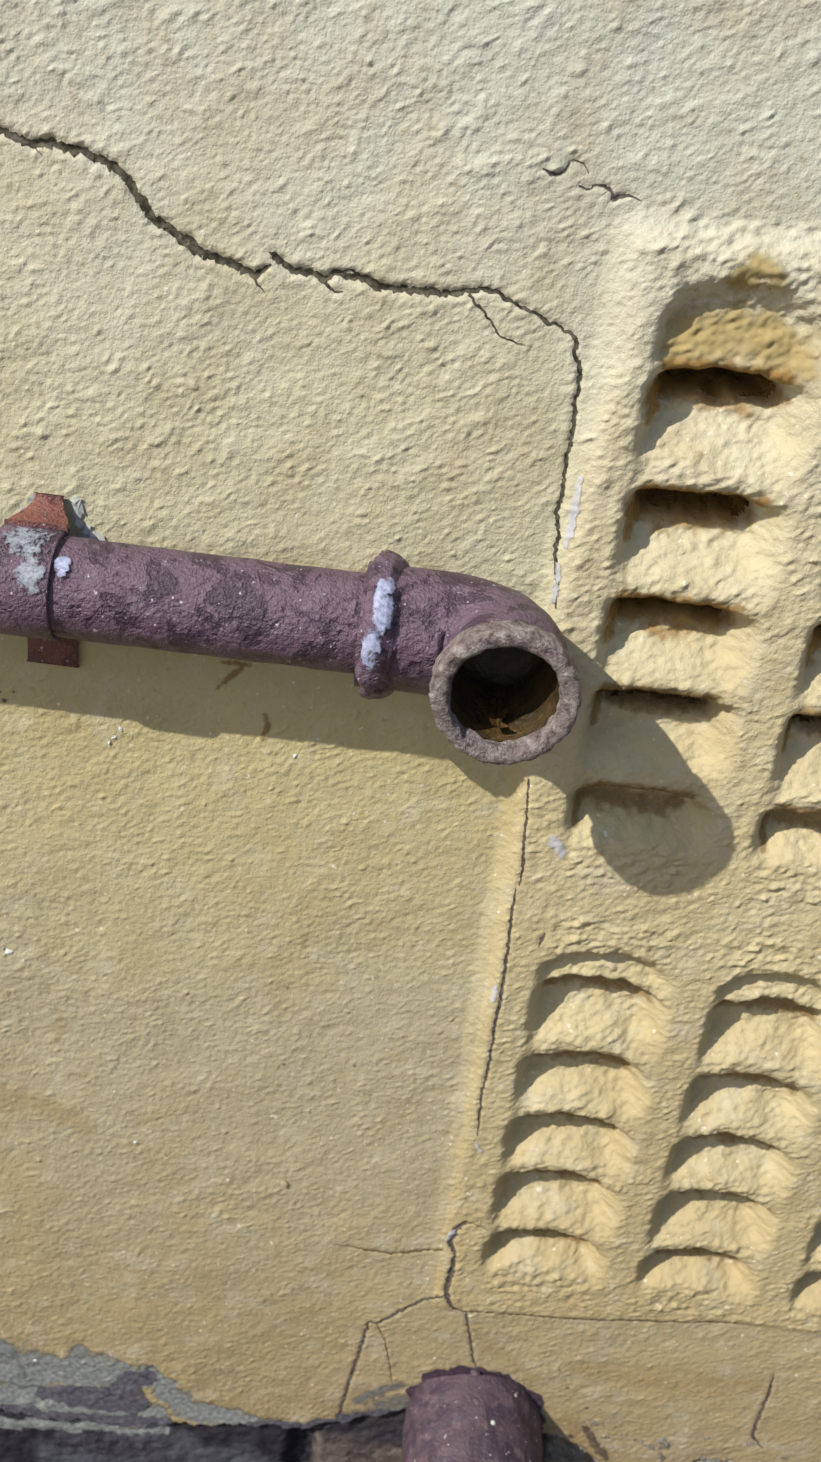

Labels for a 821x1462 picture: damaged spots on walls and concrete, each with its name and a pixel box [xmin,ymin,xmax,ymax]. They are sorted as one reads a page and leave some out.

crack [542,159,641,201]
crack [0,127,582,609]
crack [477,778,545,1136]
peeling [0,1340,395,1435]
crack [333,1221,746,1418]
crack [751,1374,774,1449]